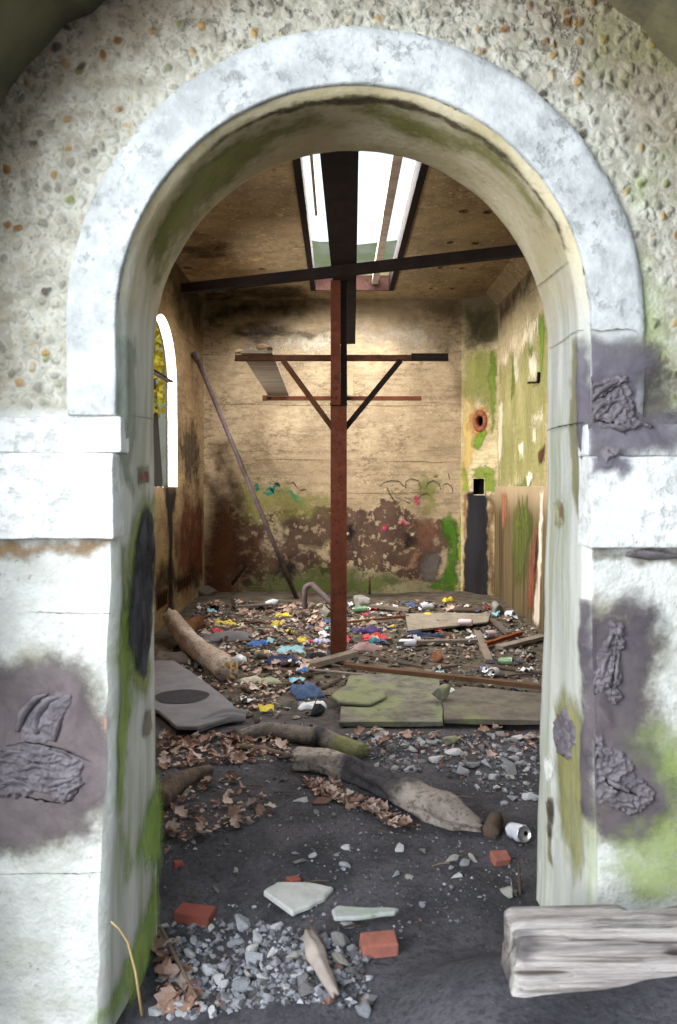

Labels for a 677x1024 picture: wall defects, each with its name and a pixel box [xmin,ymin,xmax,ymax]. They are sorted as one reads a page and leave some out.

leakage [529,316,544,371]
leakage [461,400,473,489]
leakage [576,337,677,476]
peeling [229,505,331,587]
peeling [347,499,459,582]
leakage [517,480,544,625]
leakage [577,598,677,846]